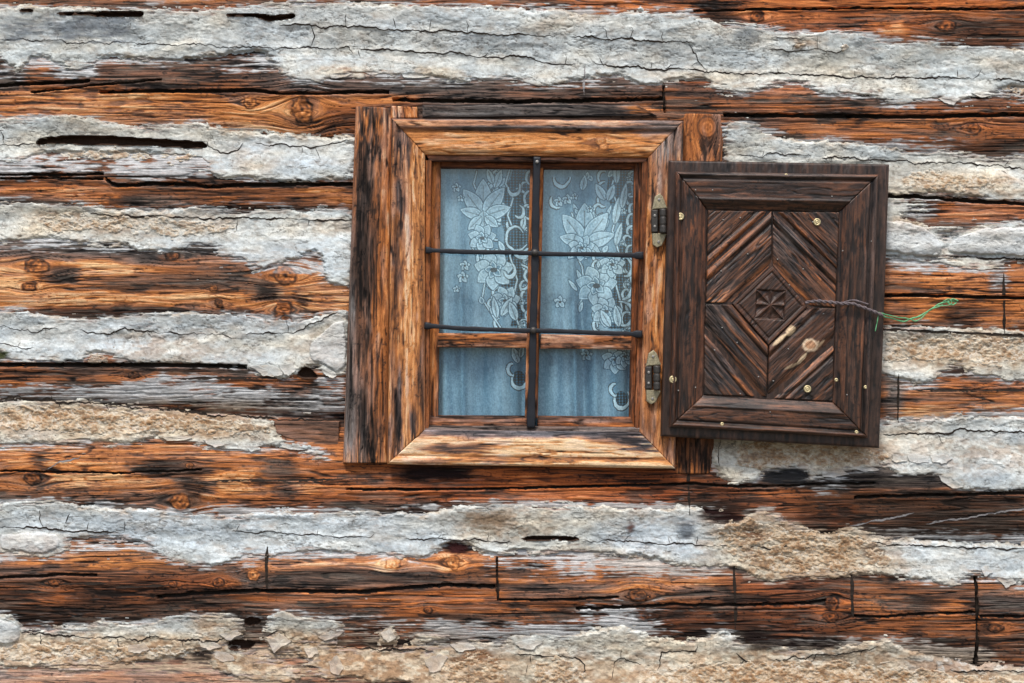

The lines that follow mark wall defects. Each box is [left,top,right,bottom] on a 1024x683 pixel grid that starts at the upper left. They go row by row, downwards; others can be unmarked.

crack [0,15,1024,104]
crack [0,139,353,189]
flaking render [250,363,337,379]
spalling [0,617,261,667]
flaking render [268,633,291,653]
flaking render [304,630,343,658]
flaking render [381,627,396,642]
flaking render [328,655,344,675]
spalling [639,656,1024,683]